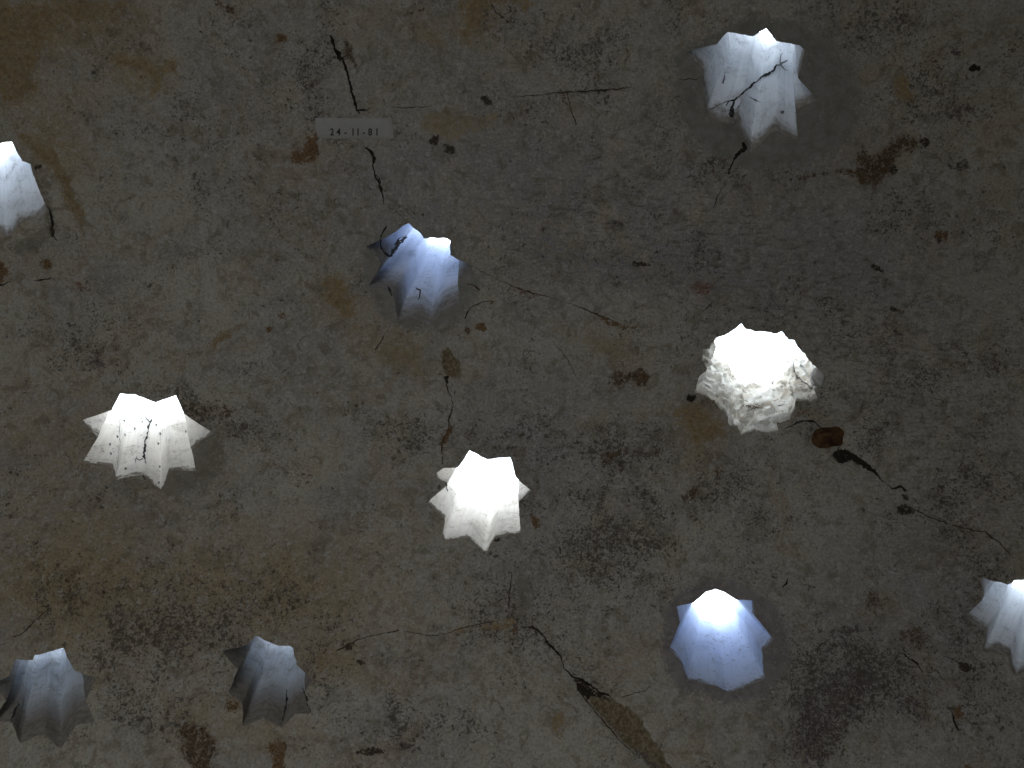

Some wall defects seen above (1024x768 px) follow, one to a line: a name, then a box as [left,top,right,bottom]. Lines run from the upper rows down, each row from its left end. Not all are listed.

crack [329,35,371,114]
rust [290,133,320,165]
crack [678,54,788,207]
rust [796,133,922,189]
crack [47,206,58,241]
crack [441,384,453,491]
crack [786,420,822,428]
crack [848,452,1011,555]
crack [336,572,650,756]